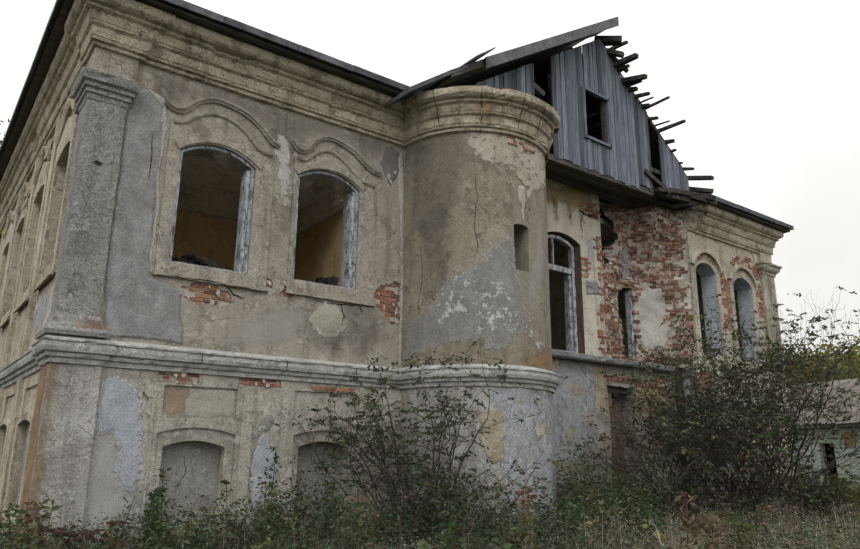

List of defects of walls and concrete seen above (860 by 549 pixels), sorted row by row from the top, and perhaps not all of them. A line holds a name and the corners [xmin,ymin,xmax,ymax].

peeling [274,135,292,200]
flaking render [380,147,399,185]
crack [474,174,491,259]
peeling [466,131,554,220]
flaking render [182,283,233,308]
flaking render [374,281,402,325]
peeling [397,234,545,359]
flaking render [158,372,199,386]
flaking render [479,201,765,521]
peeling [96,376,151,529]
peeling [249,415,277,510]